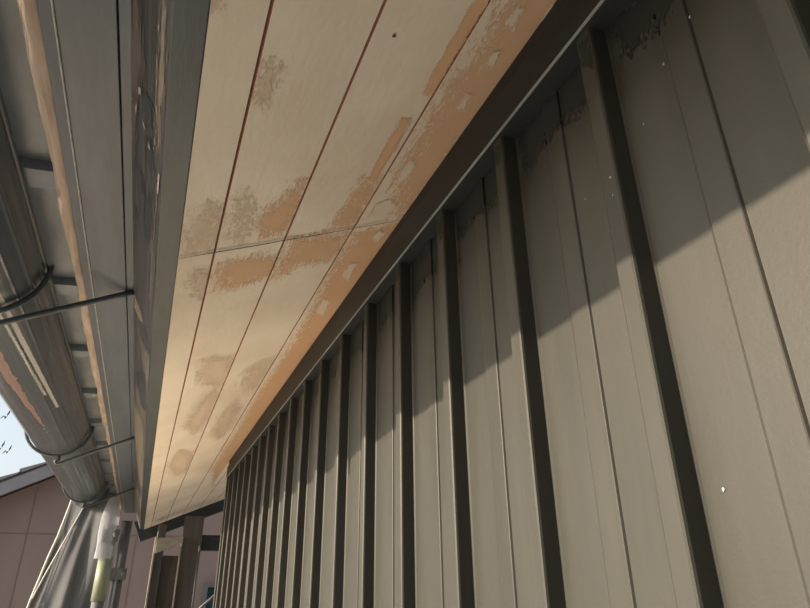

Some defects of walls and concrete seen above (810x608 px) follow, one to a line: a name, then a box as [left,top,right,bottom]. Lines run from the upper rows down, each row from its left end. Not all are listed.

peeling [130,0,168,169]
damp [518,63,588,178]
peeling [179,0,556,484]
rust [0,352,45,430]